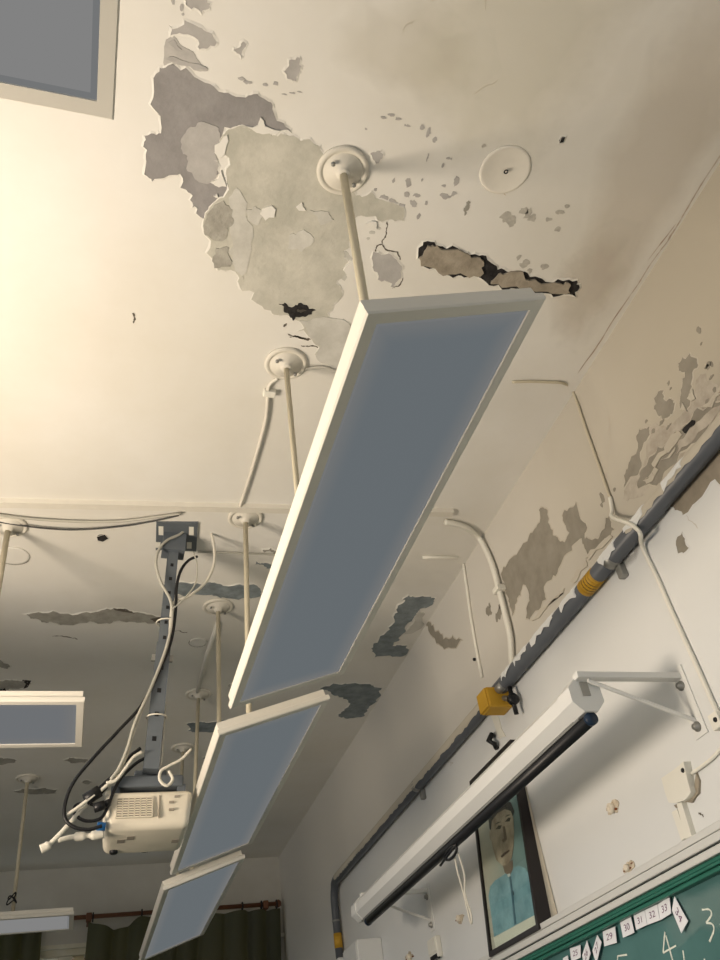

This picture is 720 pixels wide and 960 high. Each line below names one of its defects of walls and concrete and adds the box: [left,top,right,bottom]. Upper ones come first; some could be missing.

peeling [381,113,437,162]
peeling [141,0,428,370]
peeling [440,176,459,200]
peeling [499,204,570,232]
spalling [416,239,581,298]
peeling [486,326,720,681]
spalling [254,546,277,570]
spalling [178,581,263,600]
spalling [22,607,161,626]
spalling [370,594,463,658]
spalling [320,682,384,719]